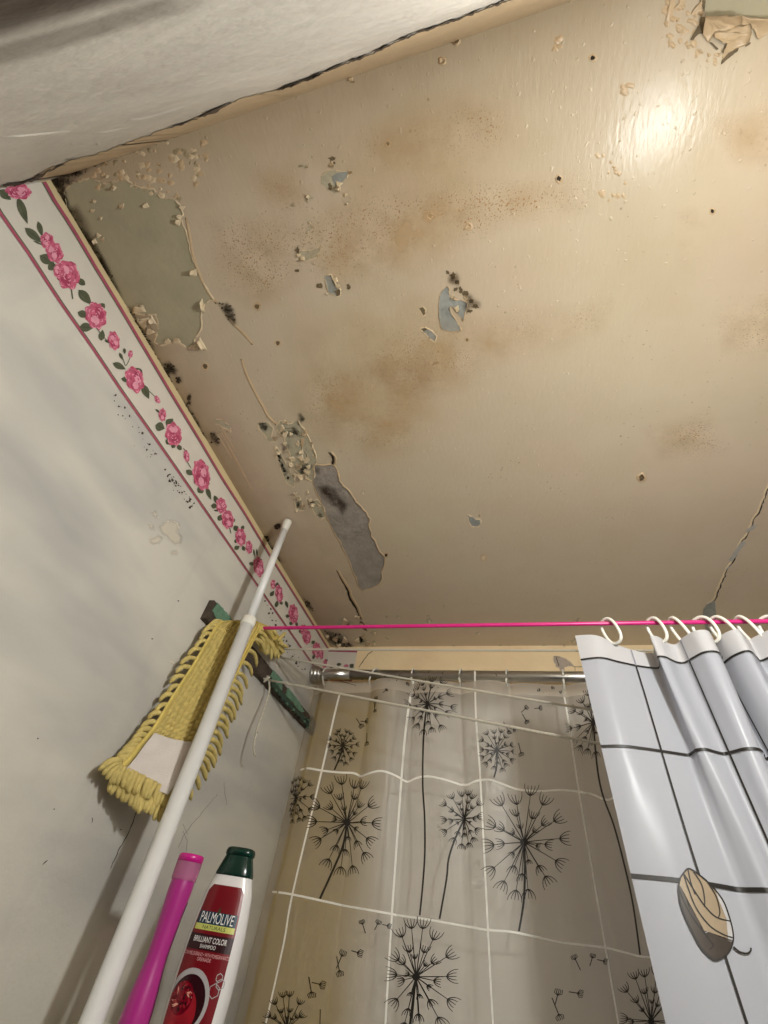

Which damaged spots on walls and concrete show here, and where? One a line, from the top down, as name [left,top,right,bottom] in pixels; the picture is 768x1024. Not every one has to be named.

peeling [665,0,768,64]
peeling [0,0,573,371]
spalling [258,416,389,591]
crack [336,570,372,667]
crack [703,485,768,633]